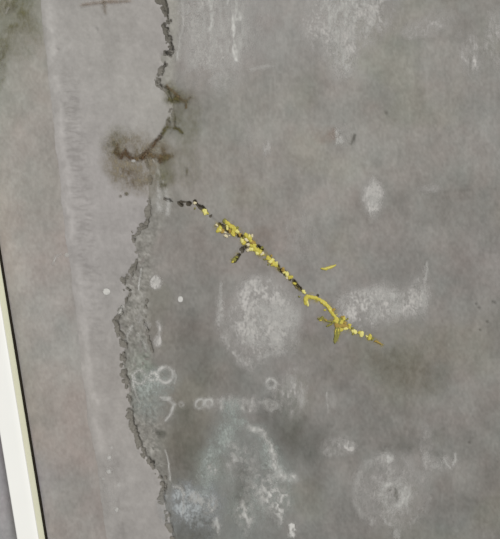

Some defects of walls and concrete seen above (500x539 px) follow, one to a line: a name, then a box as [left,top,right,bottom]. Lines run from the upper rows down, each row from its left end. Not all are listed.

crack [154,0,181,139]
spalling [116,0,185,539]
crack [112,159,383,539]